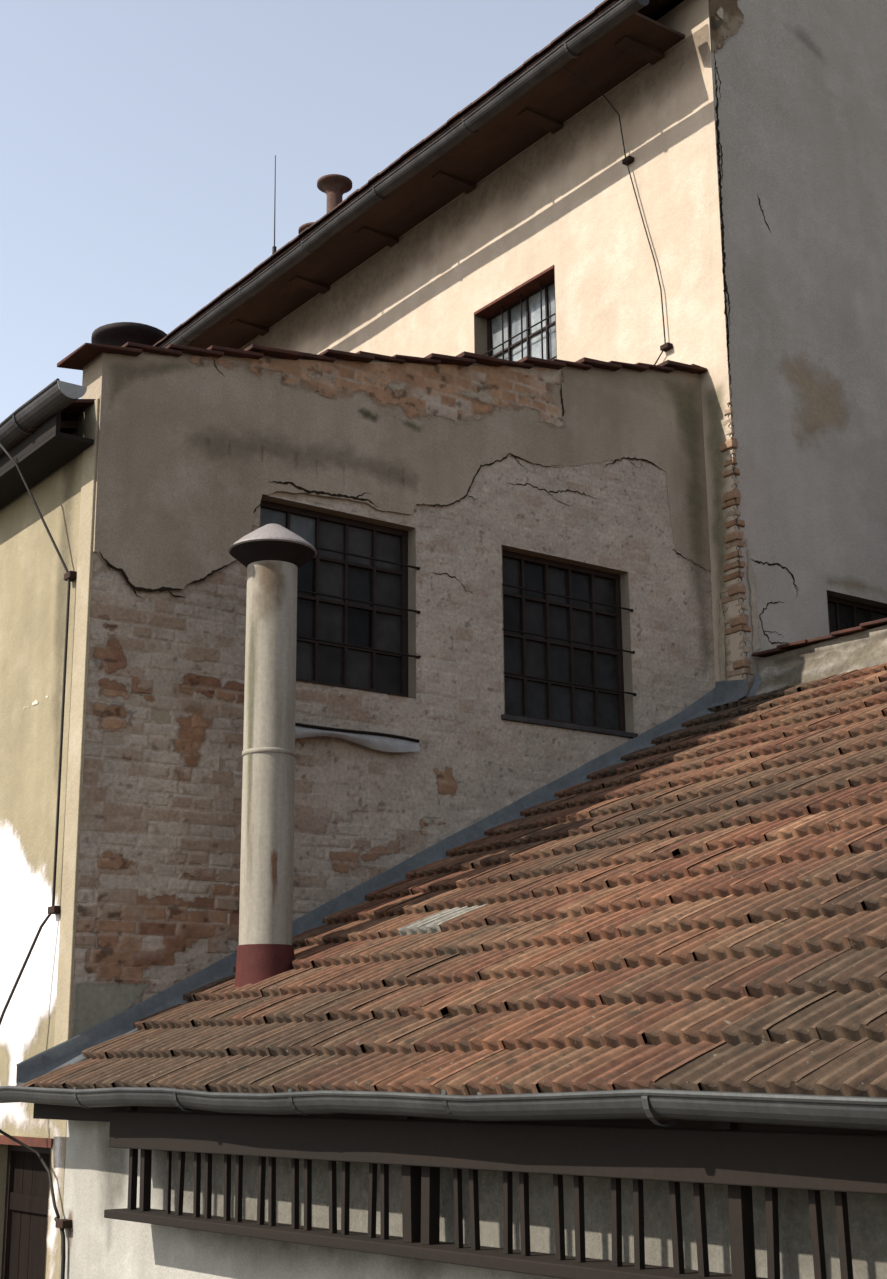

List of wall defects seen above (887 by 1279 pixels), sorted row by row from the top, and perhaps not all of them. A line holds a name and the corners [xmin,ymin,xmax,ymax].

crack [714,52,732,397]
flaking render [189,356,564,427]
crack [253,481,376,514]
crack [420,453,597,507]
crack [606,457,661,470]
crack [99,551,237,600]
crack [749,558,799,644]
flaking render [251,400,761,921]
flaking render [71,552,247,1038]
peeling [0,823,60,1086]
peeling [0,1102,42,1128]
peeling [47,1129,62,1279]